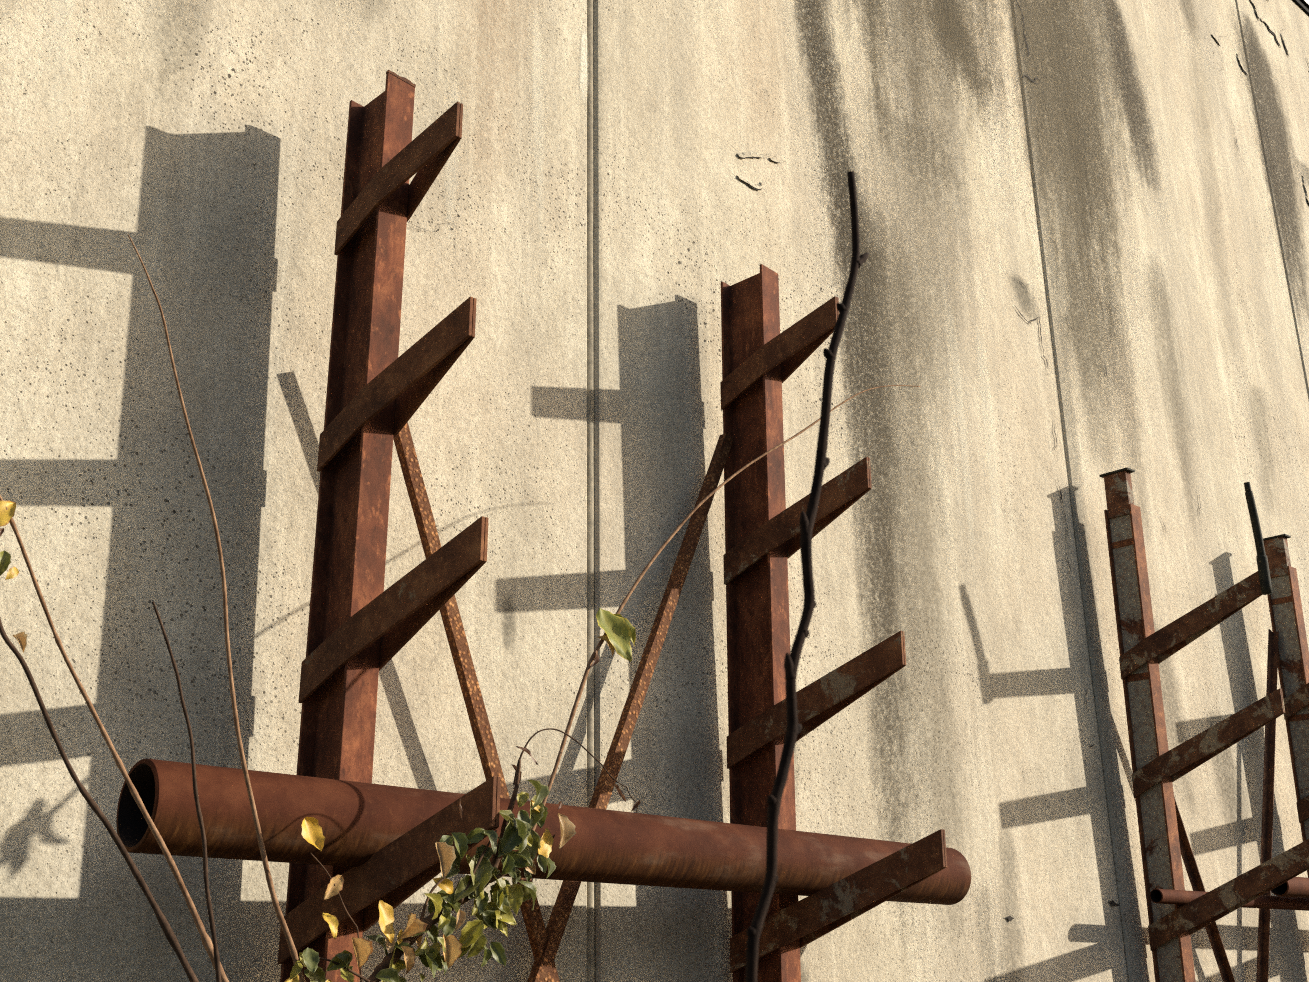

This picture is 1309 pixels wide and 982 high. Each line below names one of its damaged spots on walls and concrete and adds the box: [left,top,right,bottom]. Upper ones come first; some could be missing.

damp [865,0,986,121]
damp [1014,0,1154,330]
damp [1244,17,1309,306]
damp [796,0,897,646]
crack [1011,281,1072,378]
damp [873,675,904,841]